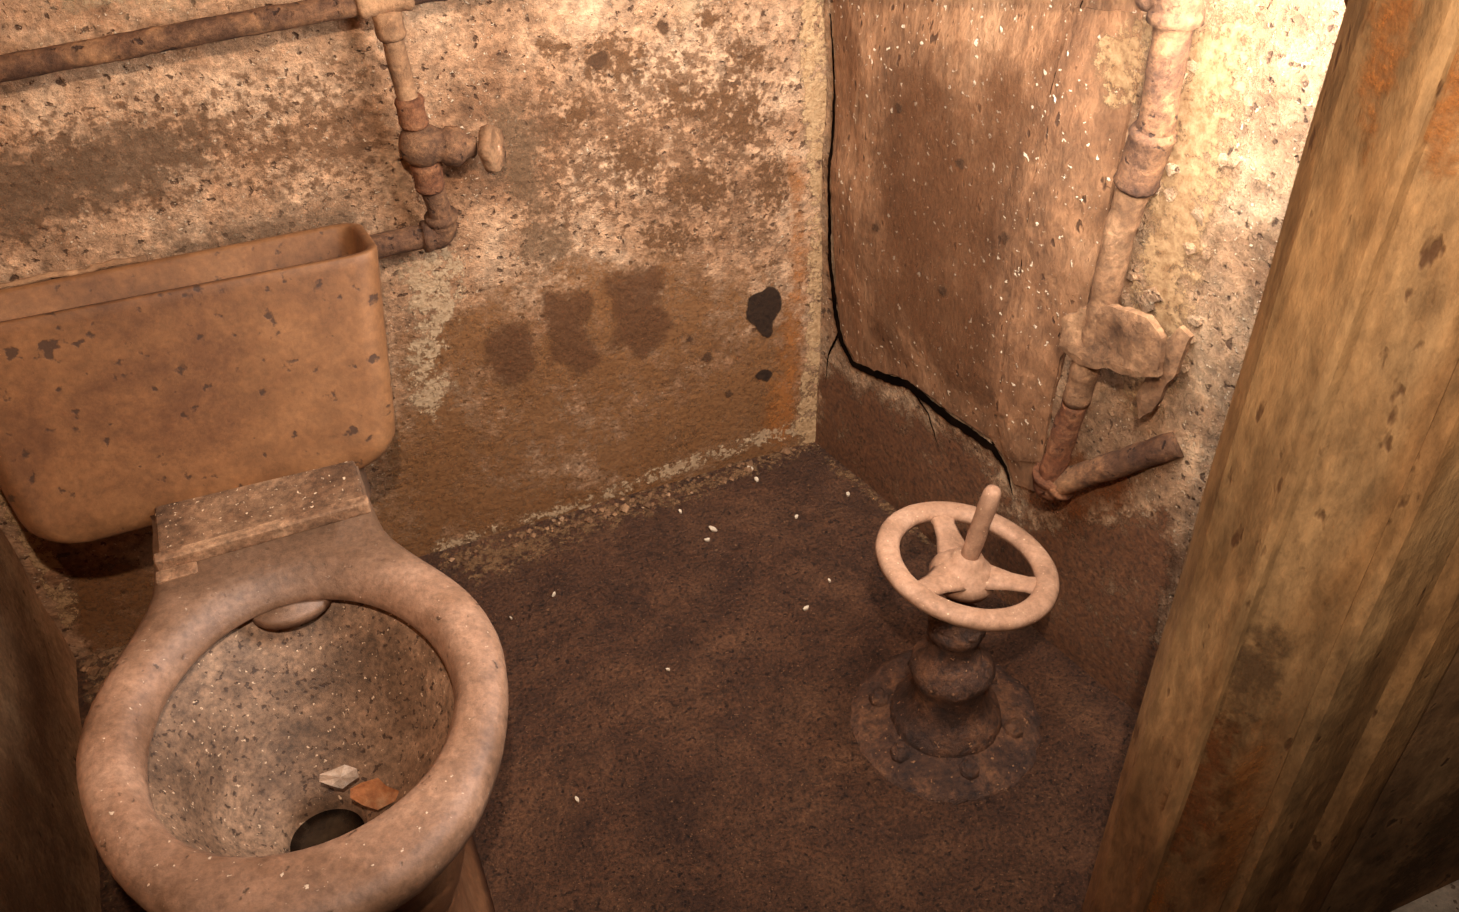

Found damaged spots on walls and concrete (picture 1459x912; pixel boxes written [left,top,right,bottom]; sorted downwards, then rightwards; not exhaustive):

leakage [0,62,383,253]
leakage [372,0,1177,713]
crack [825,13,1013,494]